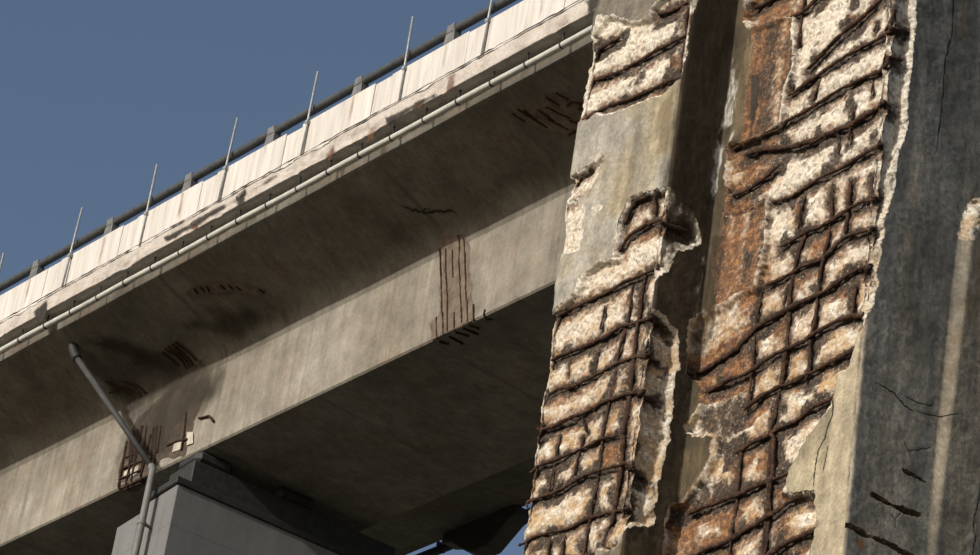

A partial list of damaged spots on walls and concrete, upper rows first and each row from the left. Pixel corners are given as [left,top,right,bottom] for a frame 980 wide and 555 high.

corrosion [736,17,792,141]
crack [1,0,580,321]
spalling [510,0,921,555]
corrosion [713,201,765,304]
crack [877,383,955,417]
spalling [902,467,926,483]
crack [972,493,980,555]